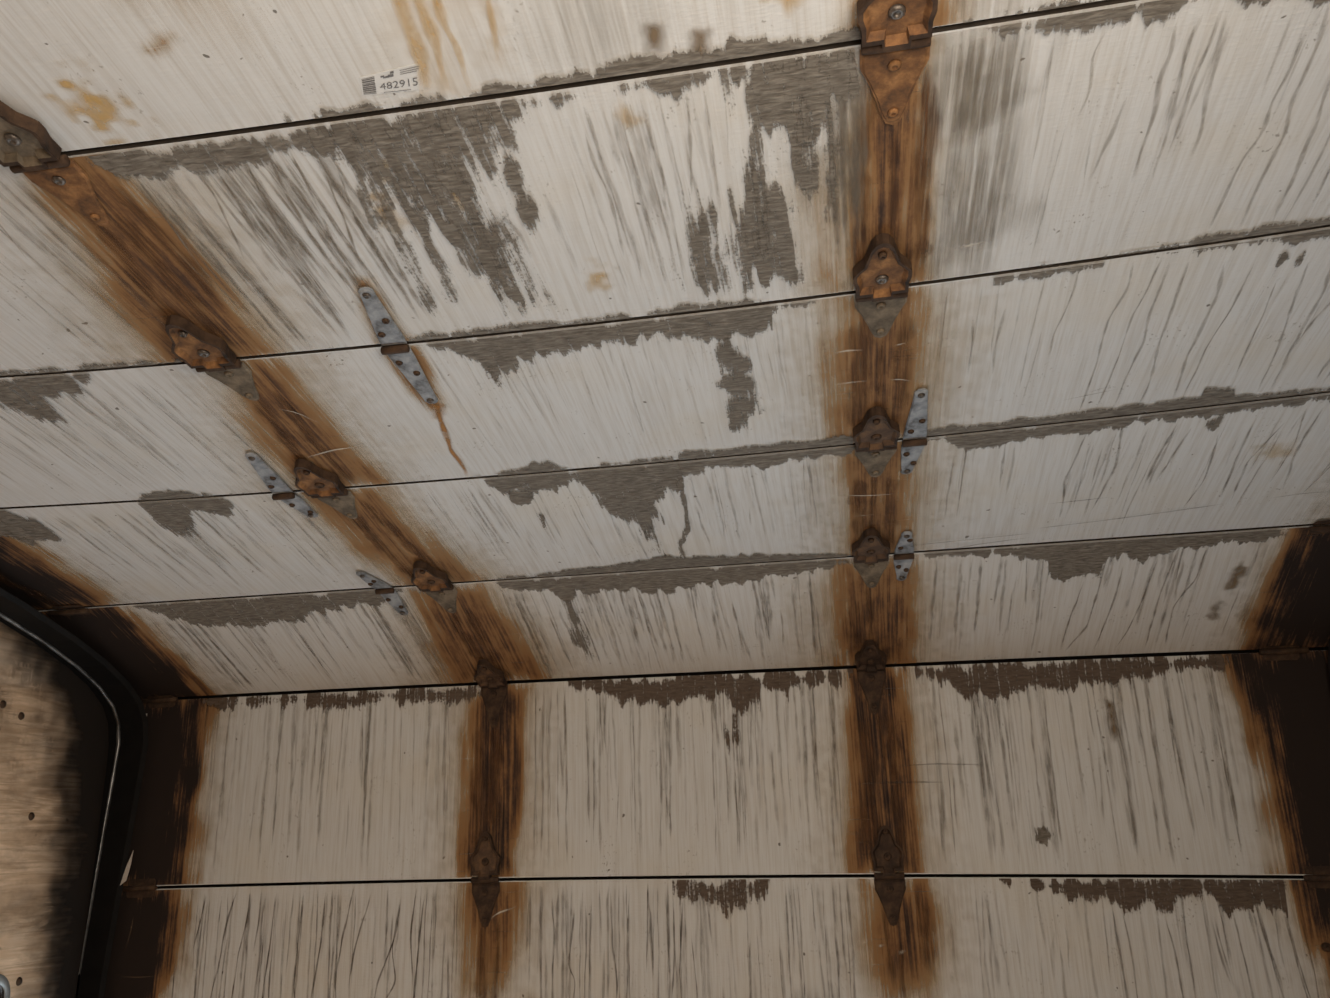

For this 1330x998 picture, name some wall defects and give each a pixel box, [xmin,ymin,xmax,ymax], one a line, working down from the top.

corrosion [850,0,861,32]
corrosion [931,0,957,46]
corrosion [0,154,551,998]
corrosion [819,64,940,998]
corrosion [1222,527,1330,985]